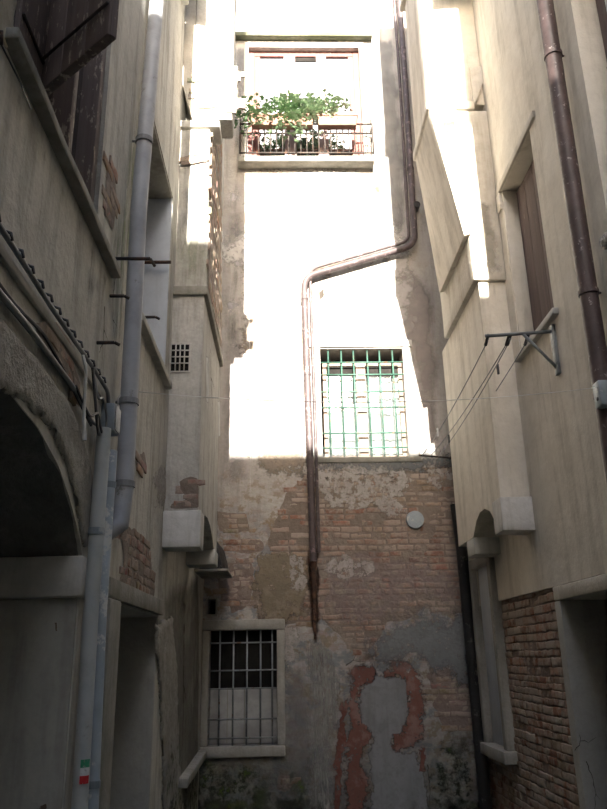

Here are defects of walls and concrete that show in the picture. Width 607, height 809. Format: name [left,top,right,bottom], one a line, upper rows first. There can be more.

flaking render [187,60,246,114]
flaking render [101,150,120,229]
flaking render [135,450,205,516]
flaking render [179,132,473,809]
flaking render [115,527,156,596]
corrosion [306,551,320,641]
leakage [165,579,199,773]